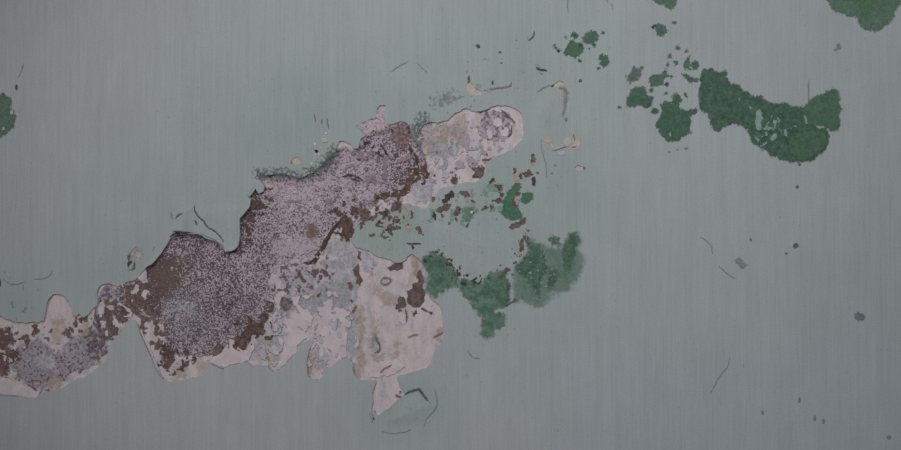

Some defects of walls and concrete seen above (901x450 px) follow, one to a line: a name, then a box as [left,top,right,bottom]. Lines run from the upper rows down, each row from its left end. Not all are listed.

peeling [0,105,539,419]
leakage [422,232,581,338]